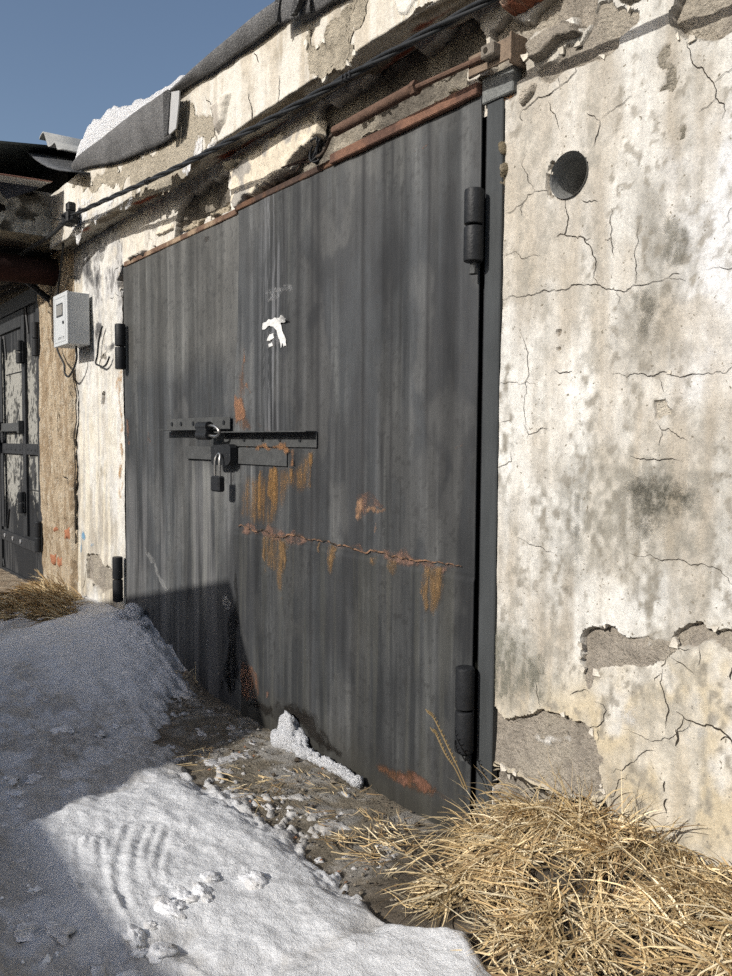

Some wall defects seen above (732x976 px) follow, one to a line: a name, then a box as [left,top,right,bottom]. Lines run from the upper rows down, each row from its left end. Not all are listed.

spalling [279,0,640,184]
spalling [659,0,732,92]
peeling [72,100,215,243]
crack [505,151,683,305]
rust [234,397,245,424]
crack [612,367,731,392]
rust [243,443,306,588]
rust [356,495,380,518]
crack [635,554,731,584]
spalling [577,622,732,689]
crack [493,648,732,811]
rust [379,767,433,793]